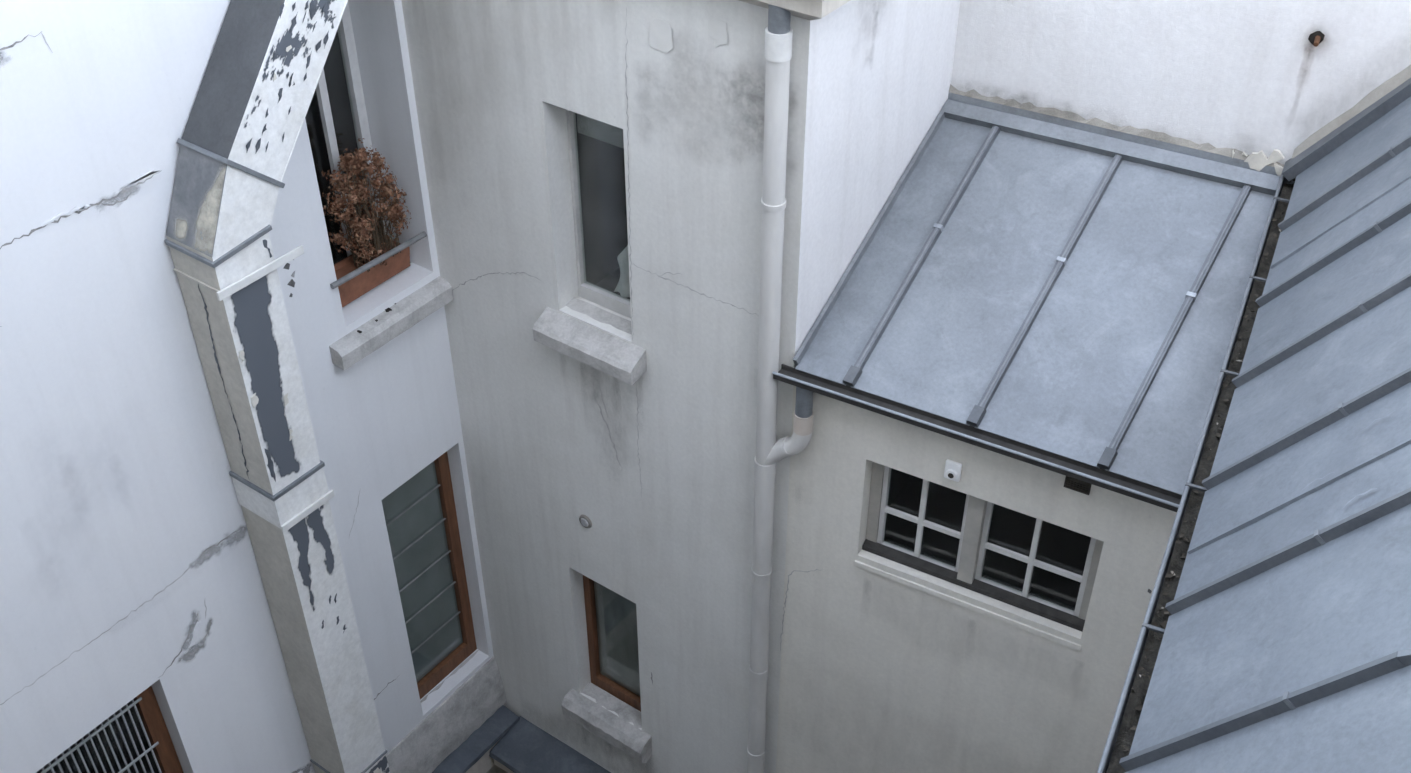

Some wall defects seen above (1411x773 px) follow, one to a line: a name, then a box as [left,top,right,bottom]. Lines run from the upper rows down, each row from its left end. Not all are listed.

peeling [244,0,336,152]
crack [0,170,162,249]
spalling [263,240,295,297]
peeling [231,275,300,482]
crack [0,527,246,705]
peeling [288,505,346,633]
peeling [369,756,390,773]